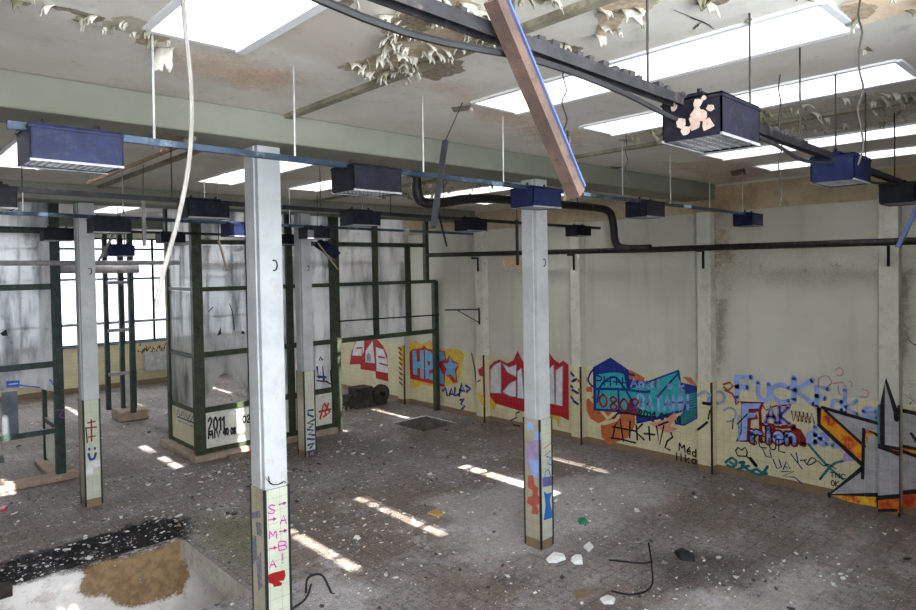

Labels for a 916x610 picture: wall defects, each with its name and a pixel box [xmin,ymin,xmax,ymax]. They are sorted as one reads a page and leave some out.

peeling [11,0,175,74]
peeling [337,11,503,87]
peeling [438,0,491,21]
peeling [518,0,564,15]
peeling [560,42,583,52]
peeling [594,0,660,48]
peeling [695,0,730,19]
peeling [841,0,916,35]
peeling [671,95,714,136]
peeling [760,103,831,135]
peeling [841,93,916,130]